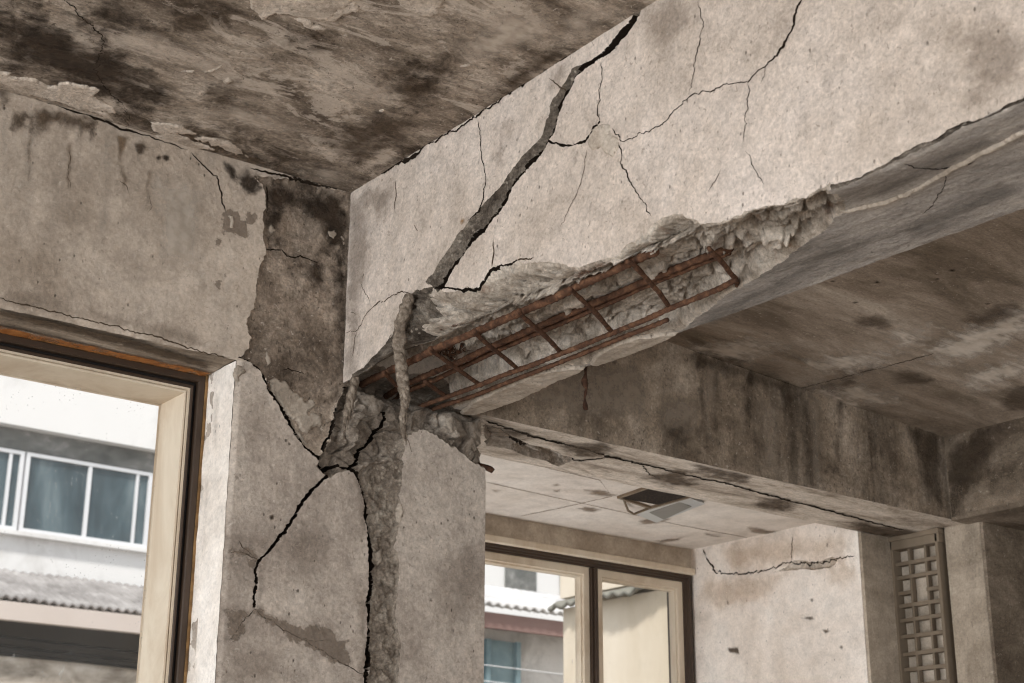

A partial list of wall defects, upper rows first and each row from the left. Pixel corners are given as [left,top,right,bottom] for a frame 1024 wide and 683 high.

damp [0,2,164,131]
damp [501,49,571,95]
damp [178,91,347,321]
crack [1,0,802,683]
rust [438,343,466,362]
spalling [216,98,1024,683]
damp [927,303,1024,366]
crack [487,421,903,530]
damp [646,465,749,486]
crack [663,521,853,575]
damp [757,499,791,511]
damp [914,431,1017,517]